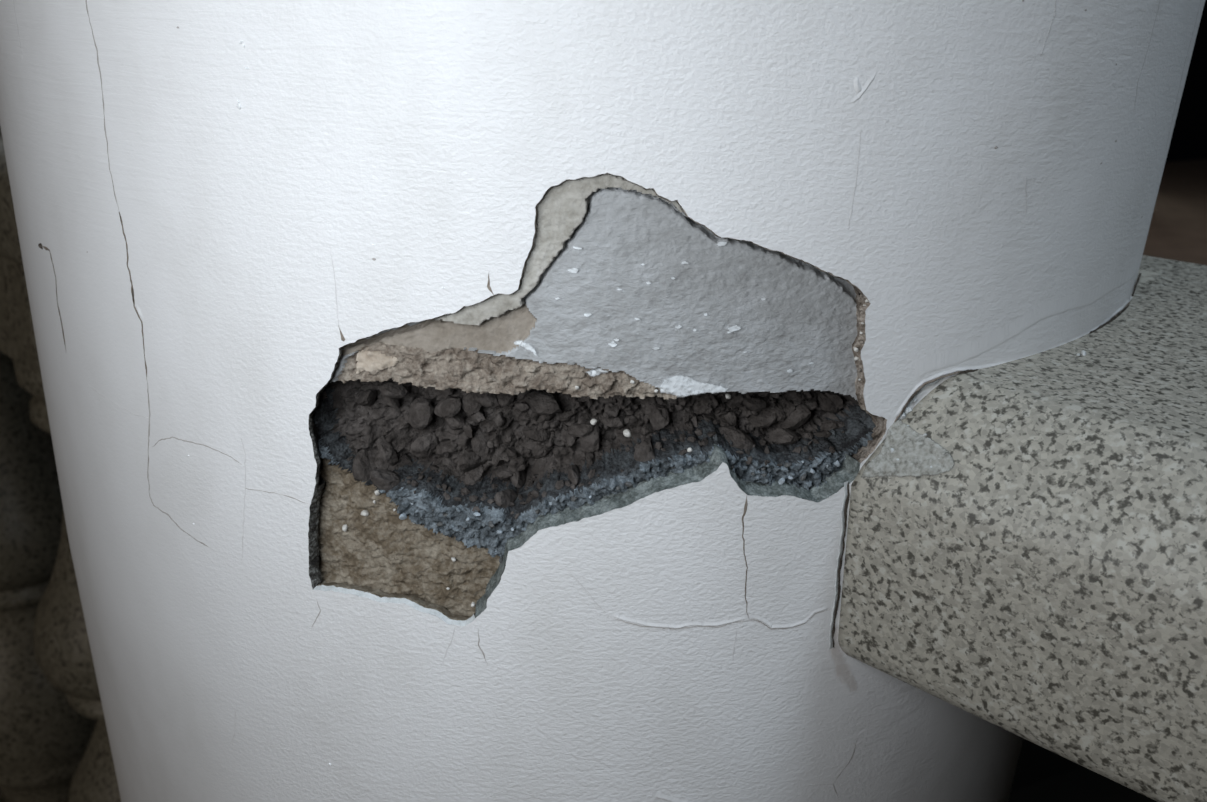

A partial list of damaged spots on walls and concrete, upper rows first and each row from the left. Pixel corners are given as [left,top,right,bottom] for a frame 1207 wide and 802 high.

crack [38,243,66,349]
crack [86,0,311,561]
flaking render [308,173,887,626]
crack [893,273,1141,422]
crack [569,482,850,657]